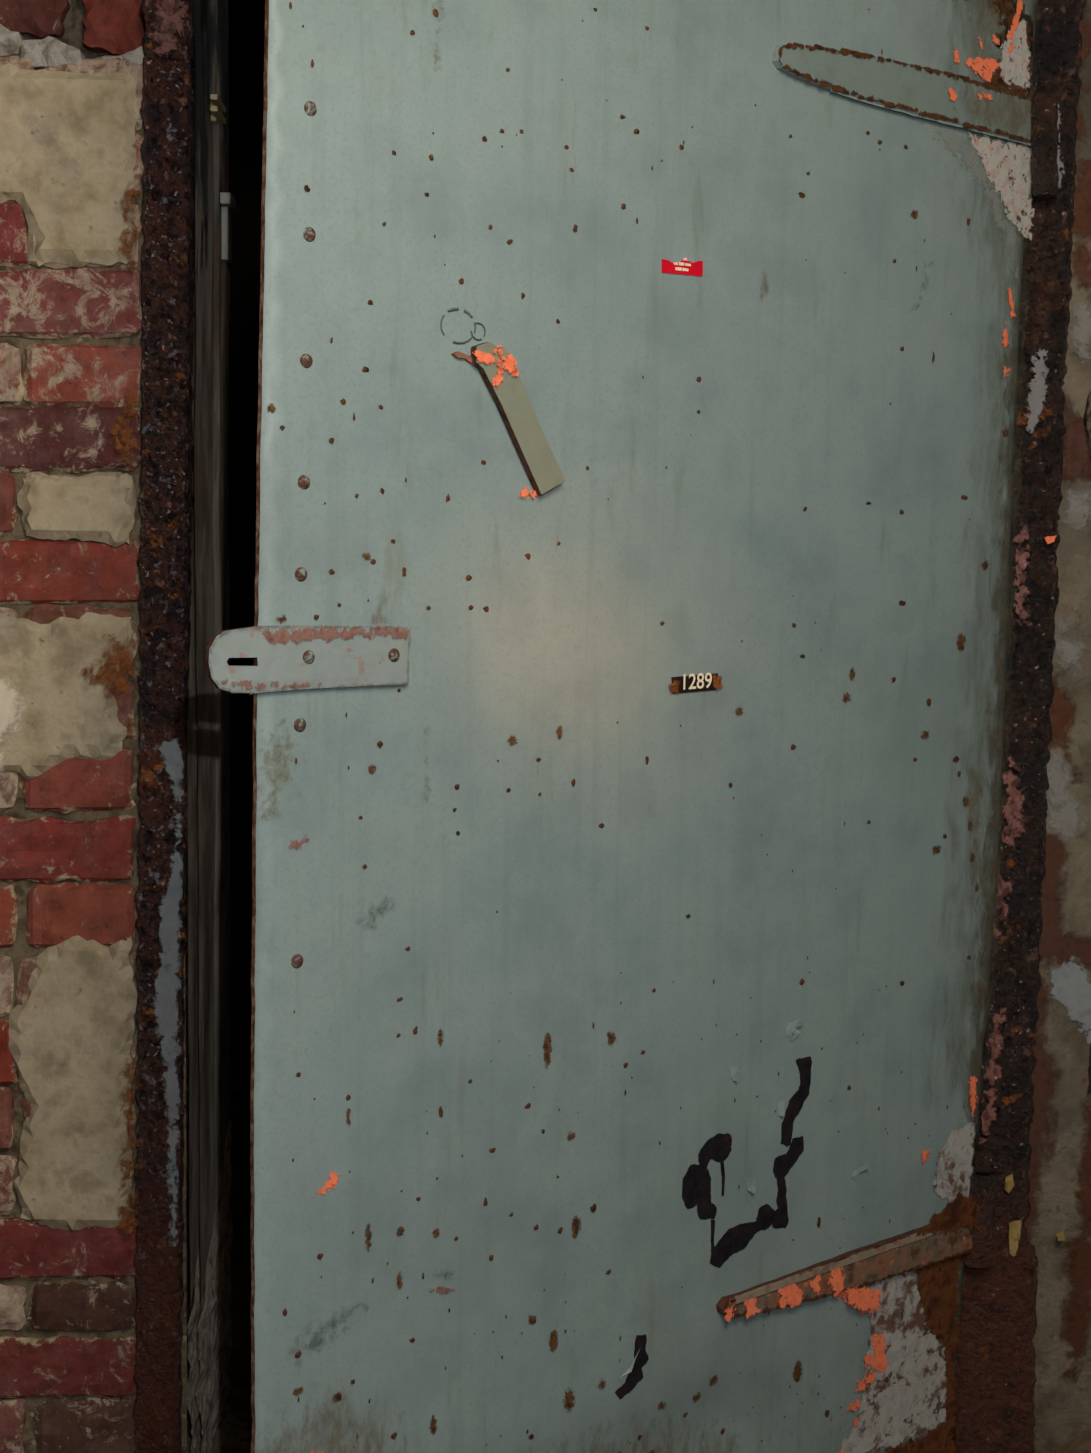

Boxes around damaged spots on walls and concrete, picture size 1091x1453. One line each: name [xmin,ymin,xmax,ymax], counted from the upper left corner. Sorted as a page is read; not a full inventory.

peeling [0,0,189,268]
rust [779,0,1035,142]
peeling [954,0,1031,100]
rust [1062,399,1091,482]
rust [263,614,410,644]
peeling [916,120,1091,1236]
rust [529,1033,552,1069]
peeling [682,1019,812,1268]
rust [557,1204,596,1238]
peeling [1008,1220,1022,1257]
rust [1061,1091,1091,1382]
peeling [778,1254,964,1453]